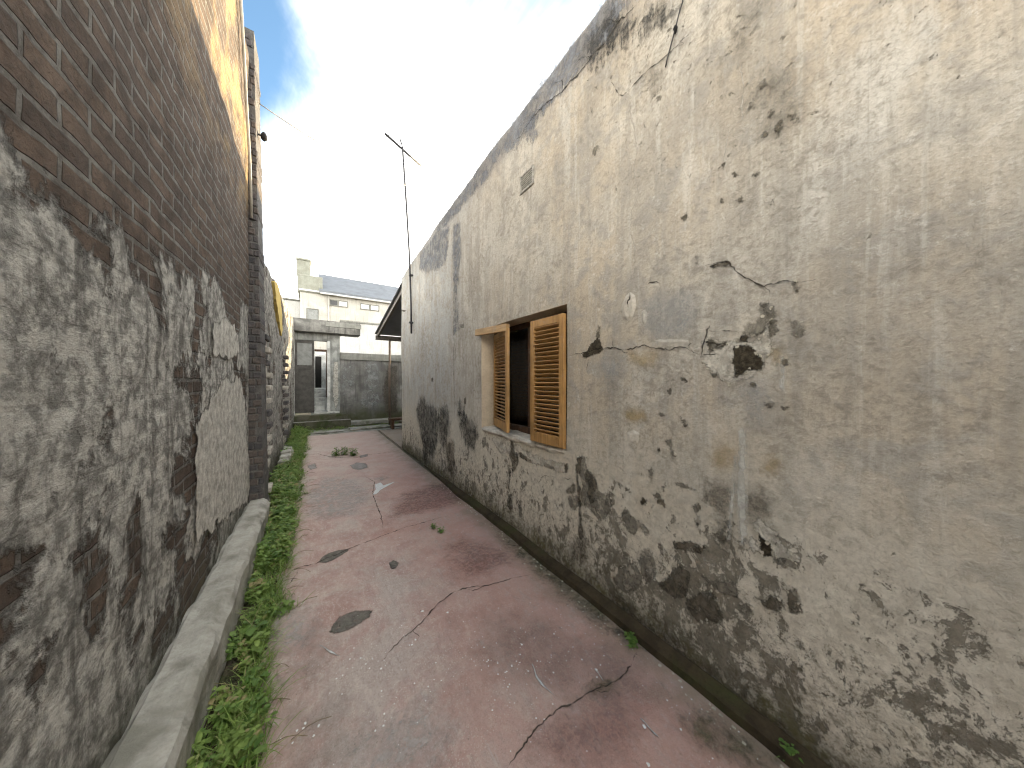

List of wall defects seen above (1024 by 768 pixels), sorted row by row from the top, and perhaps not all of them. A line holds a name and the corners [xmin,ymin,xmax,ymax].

crack [513,7,634,143]
crack [705,261,789,292]
crack [575,326,737,366]
peeling [701,303,789,388]
peeling [320,549,348,563]
damp [416,399,478,476]
damp [507,441,518,511]
damp [566,465,586,562]
spalling [614,538,803,627]
peeling [749,518,800,569]
peeling [330,610,372,634]
crack [509,666,630,765]